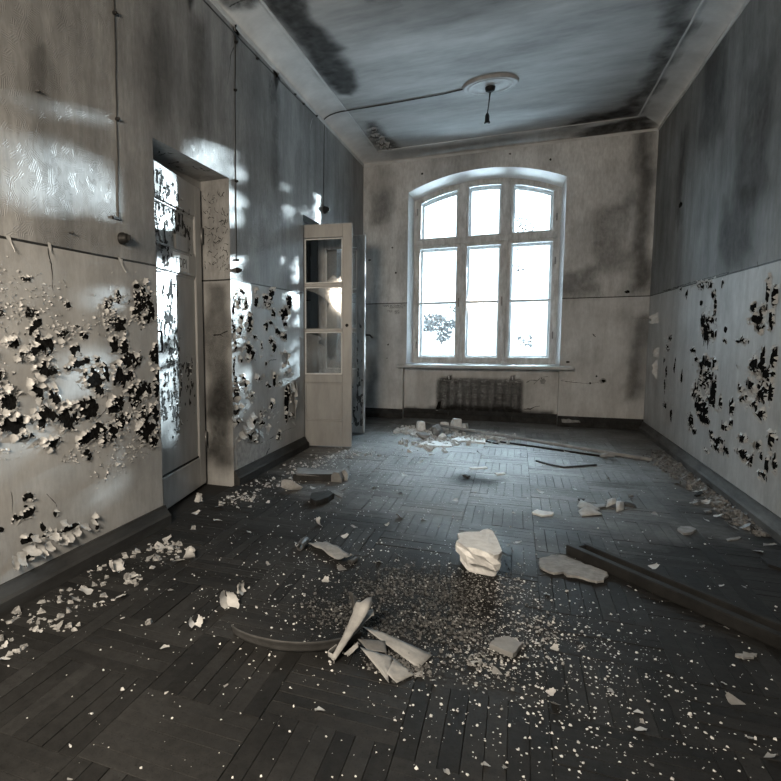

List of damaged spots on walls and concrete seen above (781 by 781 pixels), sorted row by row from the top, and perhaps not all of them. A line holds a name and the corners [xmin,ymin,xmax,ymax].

leakage [266,0,356,94]
peeling [0,168,195,489]
peeling [232,287,301,470]
peeling [652,272,780,484]
peeling [0,491,101,571]